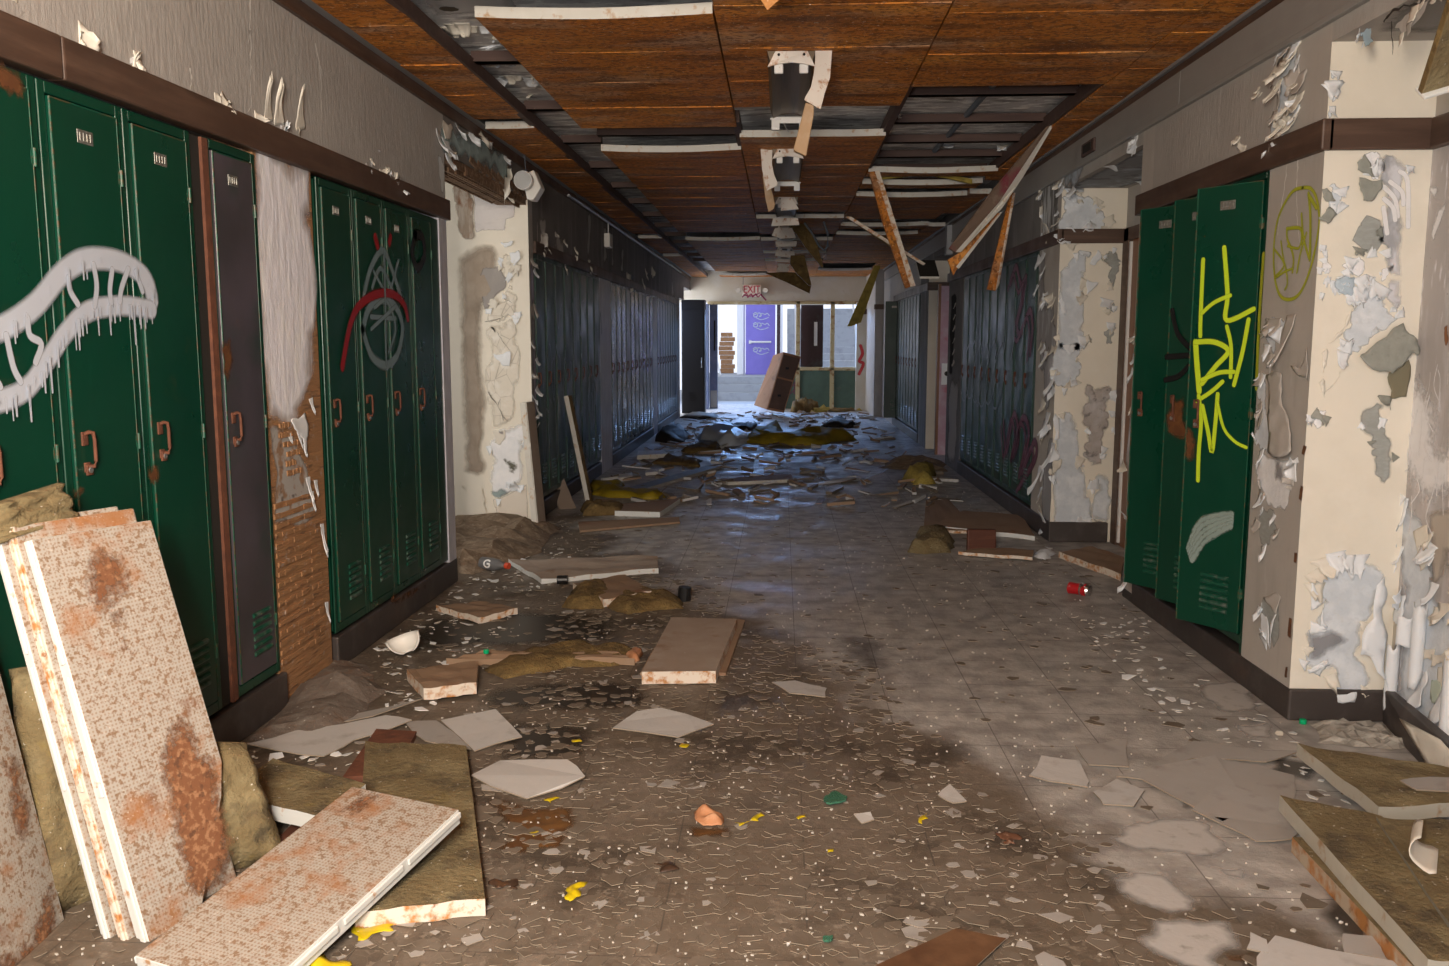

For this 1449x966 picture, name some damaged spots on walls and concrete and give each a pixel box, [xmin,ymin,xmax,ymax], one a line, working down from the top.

corrosion [0,65,23,95]
peeling [880,96,1064,151]
peeling [1231,40,1307,159]
peeling [1321,70,1345,118]
peeling [257,153,331,667]
spalling [436,120,593,506]
peeling [1027,135,1143,560]
peeling [1250,152,1420,562]
peeling [1252,593,1281,650]
peeling [1299,493,1449,767]